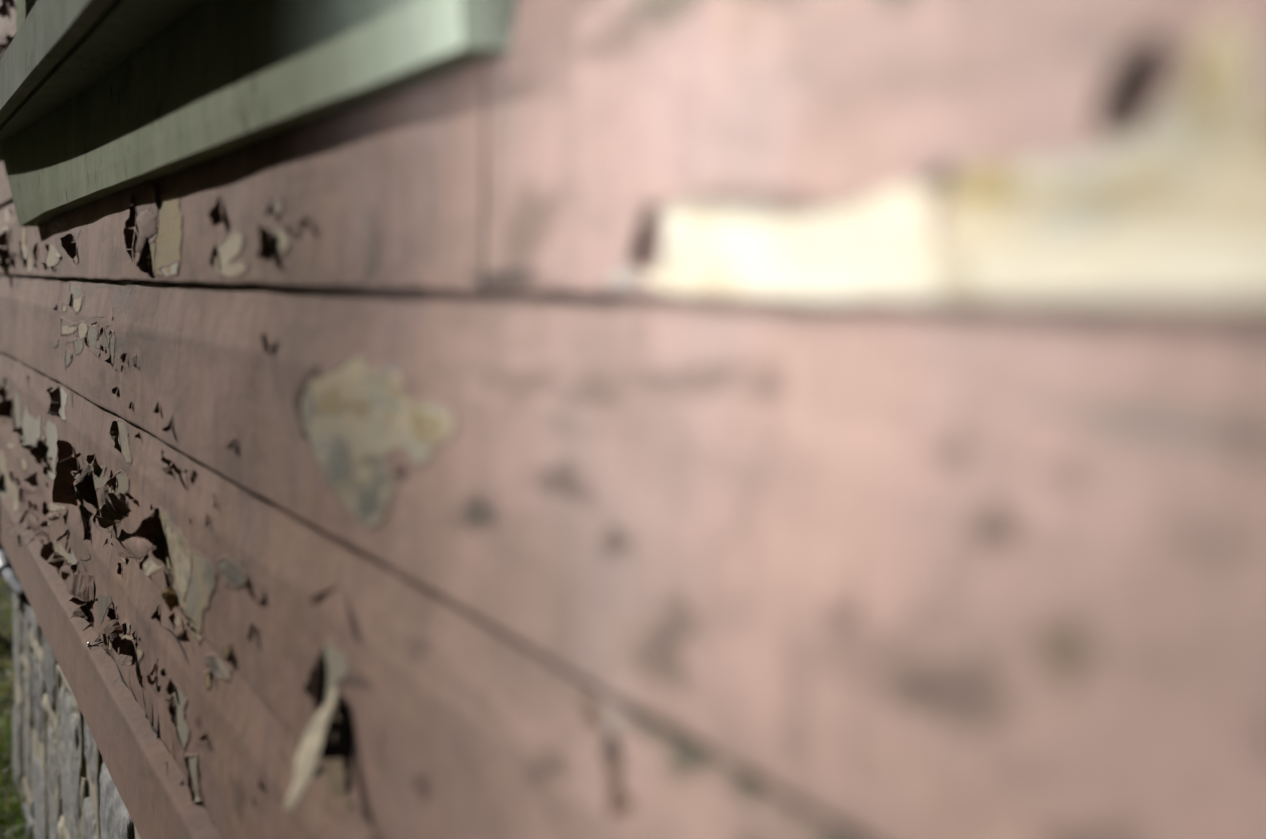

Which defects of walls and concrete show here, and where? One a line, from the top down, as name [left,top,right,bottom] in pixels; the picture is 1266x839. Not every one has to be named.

peeling [0,207,80,274]
peeling [123,180,184,280]
peeling [208,194,308,280]
peeling [628,15,1266,301]
peeling [52,281,137,394]
peeling [293,351,459,534]
peeling [0,366,257,822]
peeling [283,638,366,811]